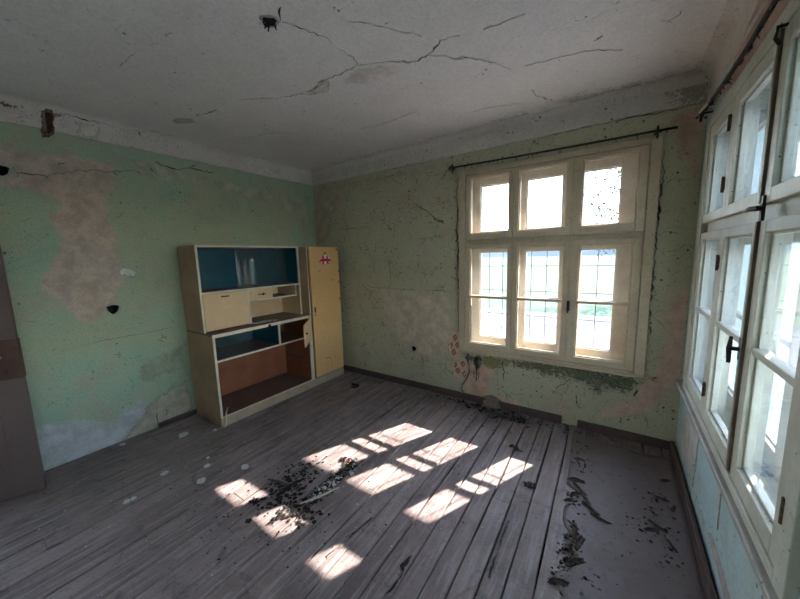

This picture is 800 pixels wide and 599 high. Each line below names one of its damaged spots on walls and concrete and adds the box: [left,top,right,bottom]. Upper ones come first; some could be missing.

crack [196,7,623,116]
peeling [0,108,144,338]
crack [13,161,214,179]
crack [363,172,459,327]
peeling [364,273,532,409]
damp [464,354,644,395]
crack [634,150,666,397]